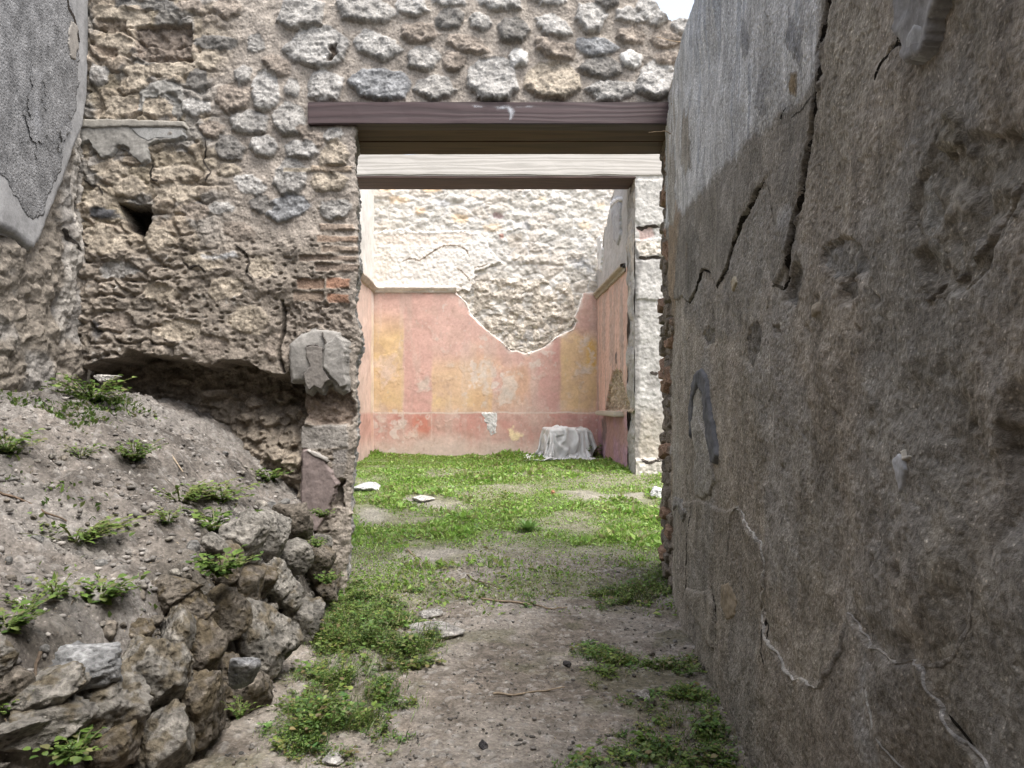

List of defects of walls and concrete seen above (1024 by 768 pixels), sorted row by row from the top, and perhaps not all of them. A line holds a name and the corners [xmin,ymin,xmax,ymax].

flaking render [0,0,189,251]
crack [683,0,832,304]
crack [874,39,902,80]
flaking render [482,412,497,436]
flaking render [403,244,583,355]
crack [725,507,990,768]